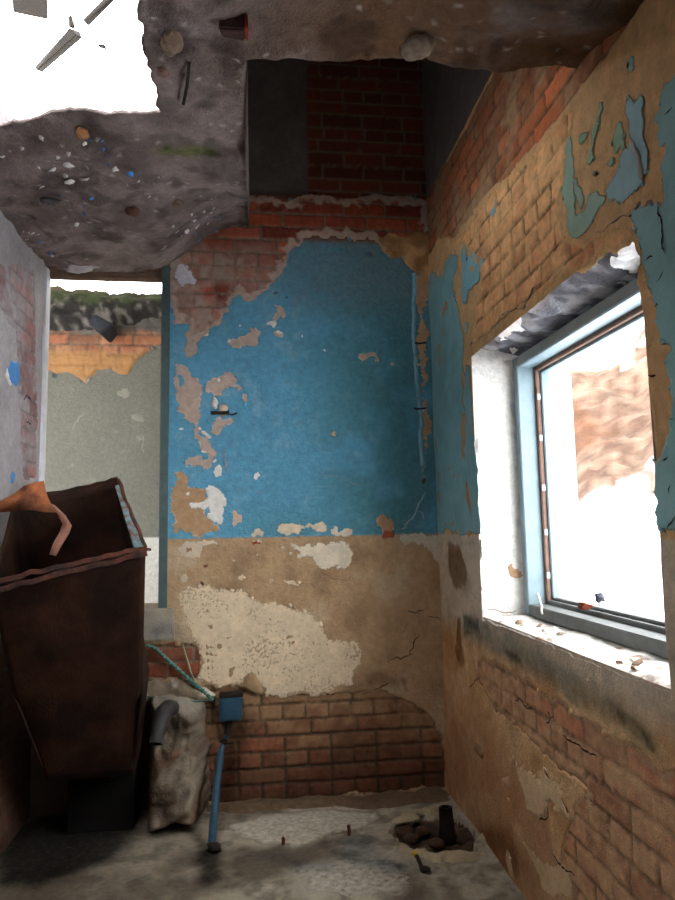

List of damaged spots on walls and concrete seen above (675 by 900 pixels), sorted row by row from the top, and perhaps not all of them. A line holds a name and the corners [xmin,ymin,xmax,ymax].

peeling [37,152,89,185]
peeling [82,138,140,186]
peeling [63,264,100,274]
spalling [170,23,675,603]
spalling [0,262,38,484]
spalling [145,574,445,804]
crack [361,609,440,695]
crack [515,698,597,757]
spalling [477,656,675,900]